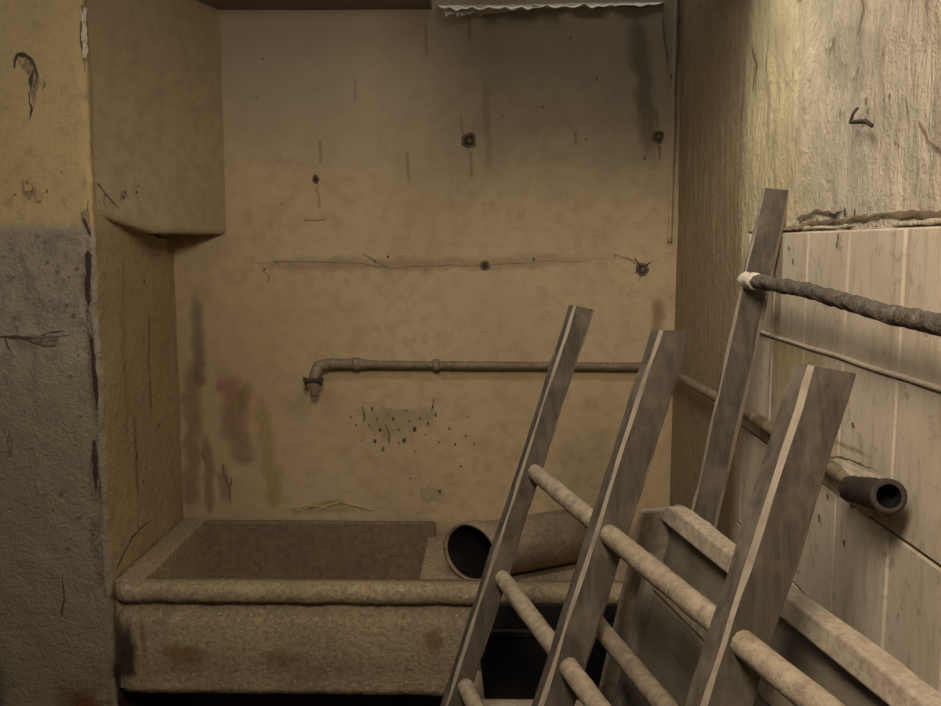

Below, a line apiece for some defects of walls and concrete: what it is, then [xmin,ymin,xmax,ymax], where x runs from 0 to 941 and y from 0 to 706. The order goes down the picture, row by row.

crack [13,52,45,120]
crack [254,253,648,283]
crack [0,331,71,353]